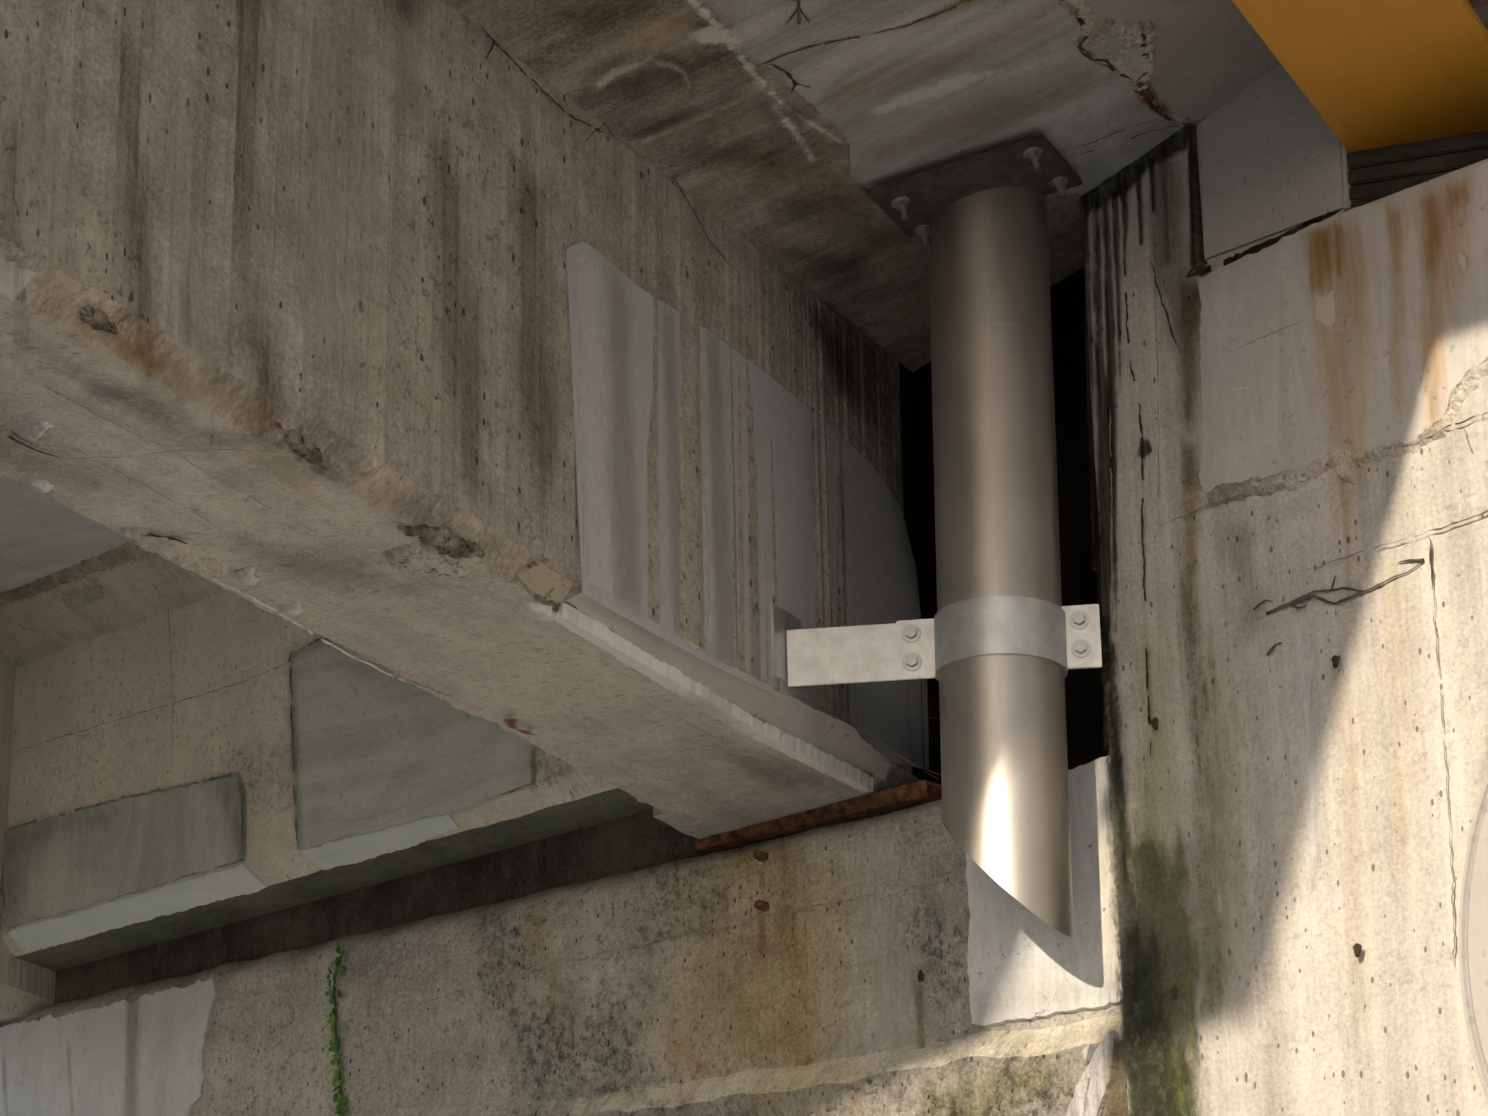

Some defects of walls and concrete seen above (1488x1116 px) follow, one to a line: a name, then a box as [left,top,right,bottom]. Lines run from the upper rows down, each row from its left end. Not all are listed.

crack [755,0,971,94]
spalling [1060,0,1196,126]
rust [1315,289,1336,326]
peeling [1162,362,1488,525]
water stain [1080,125,1196,1116]
water stain [1182,590,1222,1012]
crack [1298,510,1488,967]
peeling [1066,1030,1120,1116]